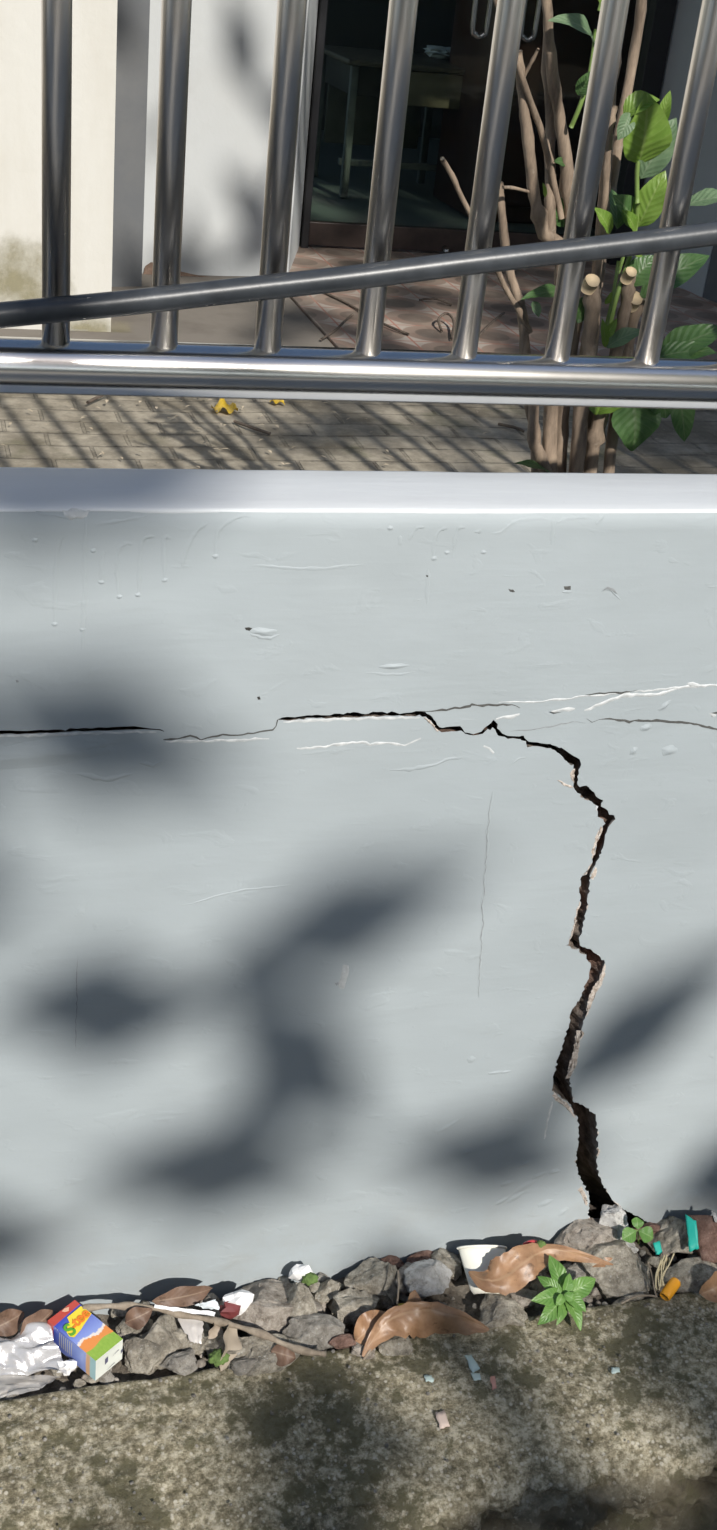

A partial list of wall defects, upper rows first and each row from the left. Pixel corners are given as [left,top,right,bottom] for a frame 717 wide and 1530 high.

crack [0,703,717,1222]